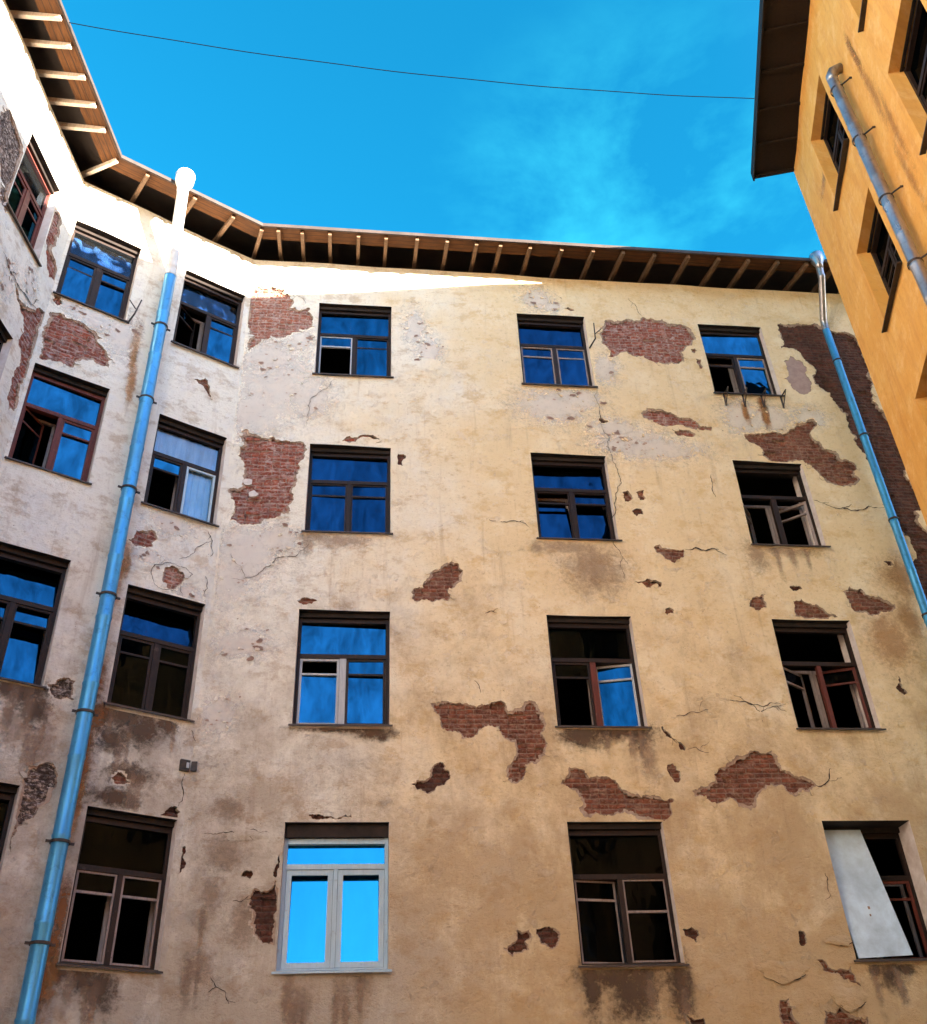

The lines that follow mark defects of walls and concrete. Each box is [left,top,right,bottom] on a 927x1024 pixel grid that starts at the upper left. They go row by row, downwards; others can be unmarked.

spalling [0,258,143,411]
spalling [228,285,327,525]
crack [594,395,628,573]
spalling [524,316,927,600]
crack [151,532,309,597]
spalling [411,561,463,602]
damp [90,704,178,809]
spalling [431,697,551,784]
spalling [560,767,674,821]
spalling [692,750,817,810]
crack [732,695,787,721]
damp [577,952,694,1021]